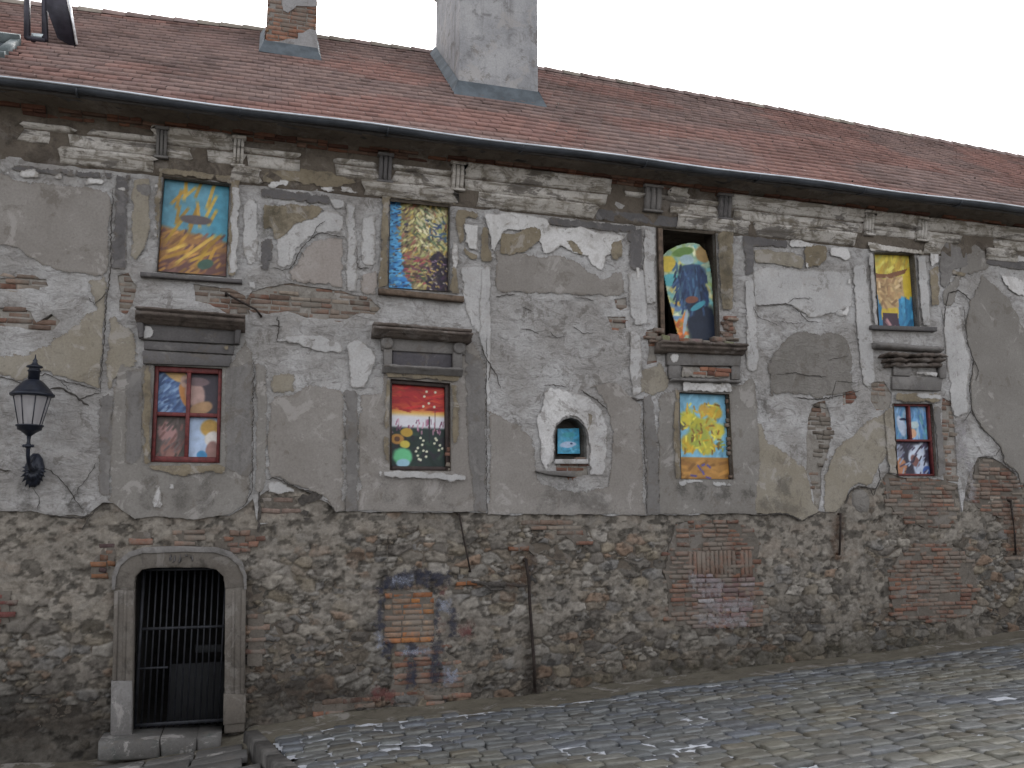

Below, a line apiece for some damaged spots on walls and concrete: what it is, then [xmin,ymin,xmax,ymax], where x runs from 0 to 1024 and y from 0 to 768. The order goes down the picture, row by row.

crack [276,221,368,271]
flaking render [452,210,624,270]
spalling [0,273,48,292]
spalling [0,307,60,331]
spalling [194,283,381,322]
crack [944,290,1022,489]
crack [34,463,99,530]
spalling [261,481,323,521]
spalling [806,401,834,513]
spalling [882,398,1024,561]
spalling [887,543,982,623]
spalling [313,589,477,717]